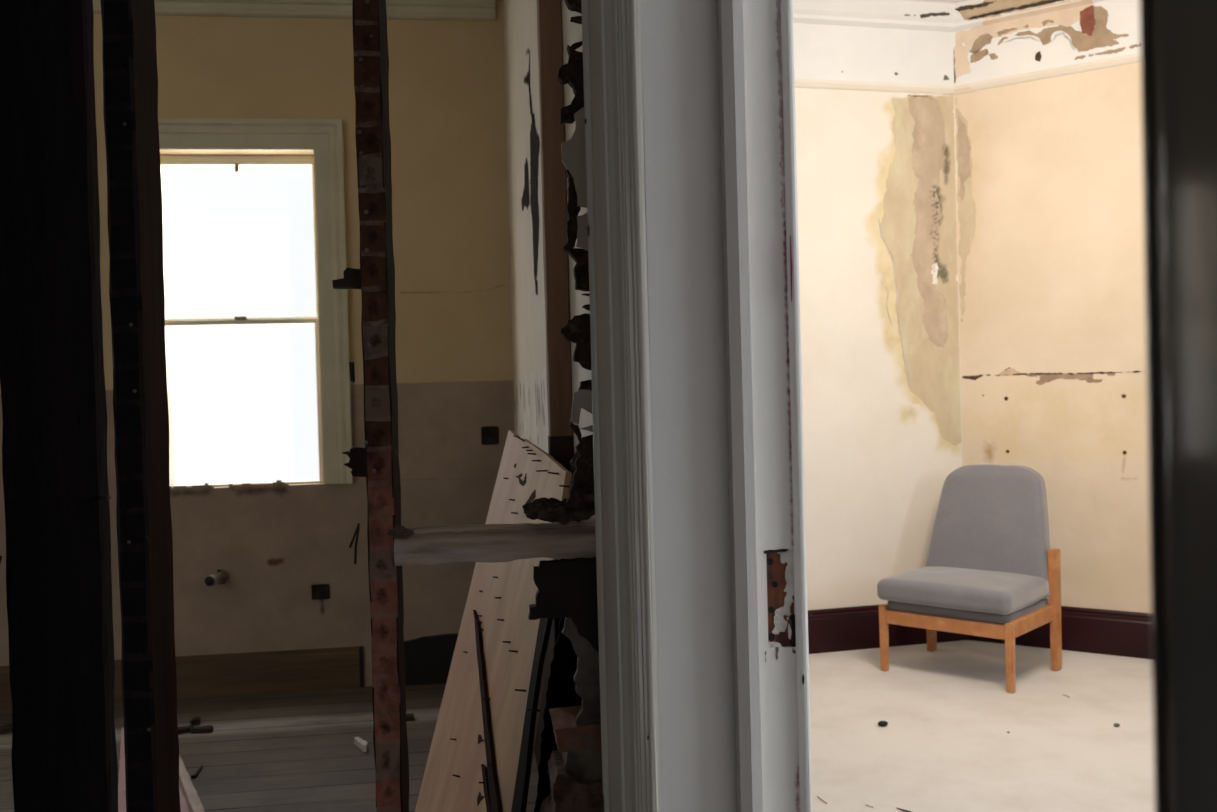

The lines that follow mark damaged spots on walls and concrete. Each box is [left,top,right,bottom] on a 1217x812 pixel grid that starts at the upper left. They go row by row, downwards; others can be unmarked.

spalling [564,0,582,24]
peeling [953,0,1140,83]
spalling [557,41,595,511]
leakage [861,85,1148,478]
peeling [768,549,794,648]